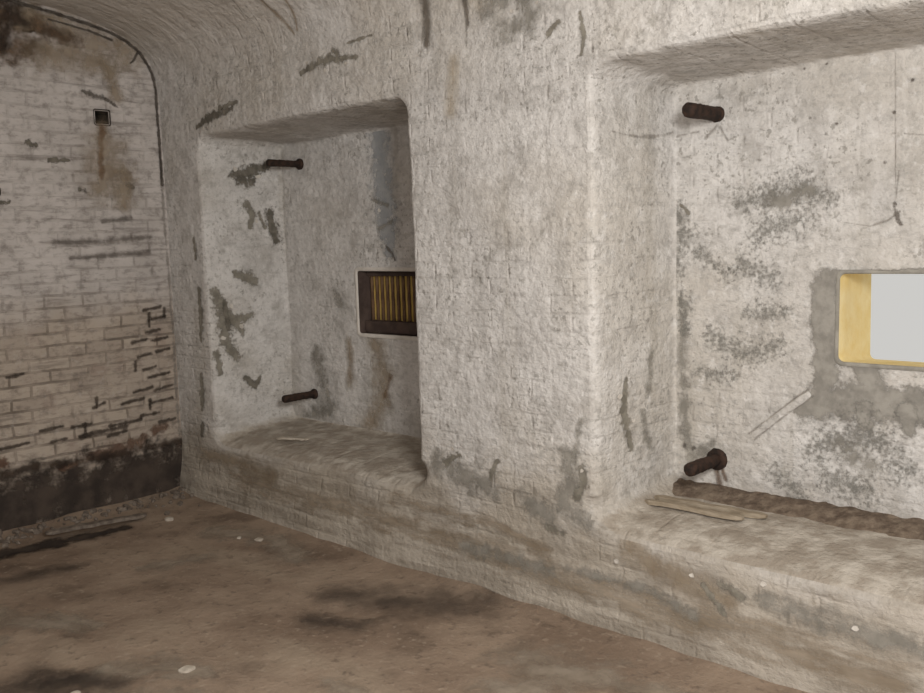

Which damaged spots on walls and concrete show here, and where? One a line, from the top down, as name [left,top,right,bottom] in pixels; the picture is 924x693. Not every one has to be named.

damp [0,0,133,101]
peeling [299,48,358,76]
peeling [196,100,238,130]
peeling [228,161,270,188]
peeling [243,200,280,245]
peeling [232,270,258,286]
peeling [197,287,253,376]
peeling [243,375,261,389]
damp [801,415,917,507]
damp [0,439,182,531]
damp [204,447,911,693]